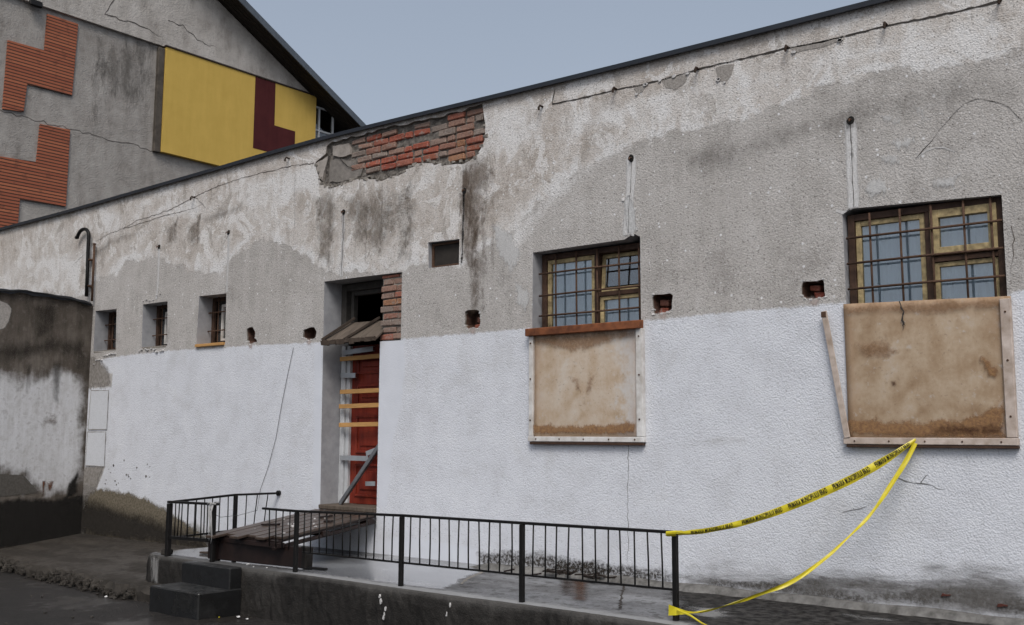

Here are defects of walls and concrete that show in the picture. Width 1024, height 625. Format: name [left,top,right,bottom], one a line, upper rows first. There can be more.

crack [552,1,997,105]
flaking render [634,72,690,96]
crack [1,110,152,152]
flaking render [314,105,488,189]
crack [97,163,313,241]
leakage [463,166,487,263]
hole [246,327,258,347]
hole [464,310,481,333]
hole [652,293,673,318]
hole [800,278,827,304]
leakage [89,357,110,389]
leakage [0,466,207,548]